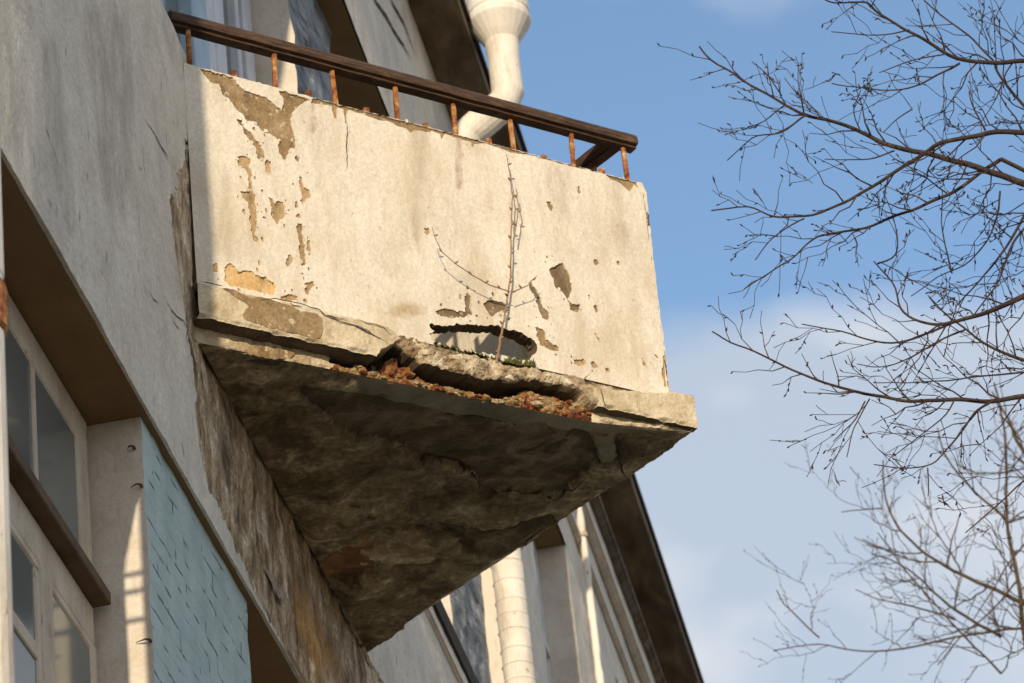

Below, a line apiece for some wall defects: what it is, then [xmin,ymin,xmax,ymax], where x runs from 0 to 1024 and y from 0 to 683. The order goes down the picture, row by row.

spalling [193,69,698,495]
crack [261,298,388,342]
crack [414,429,626,501]